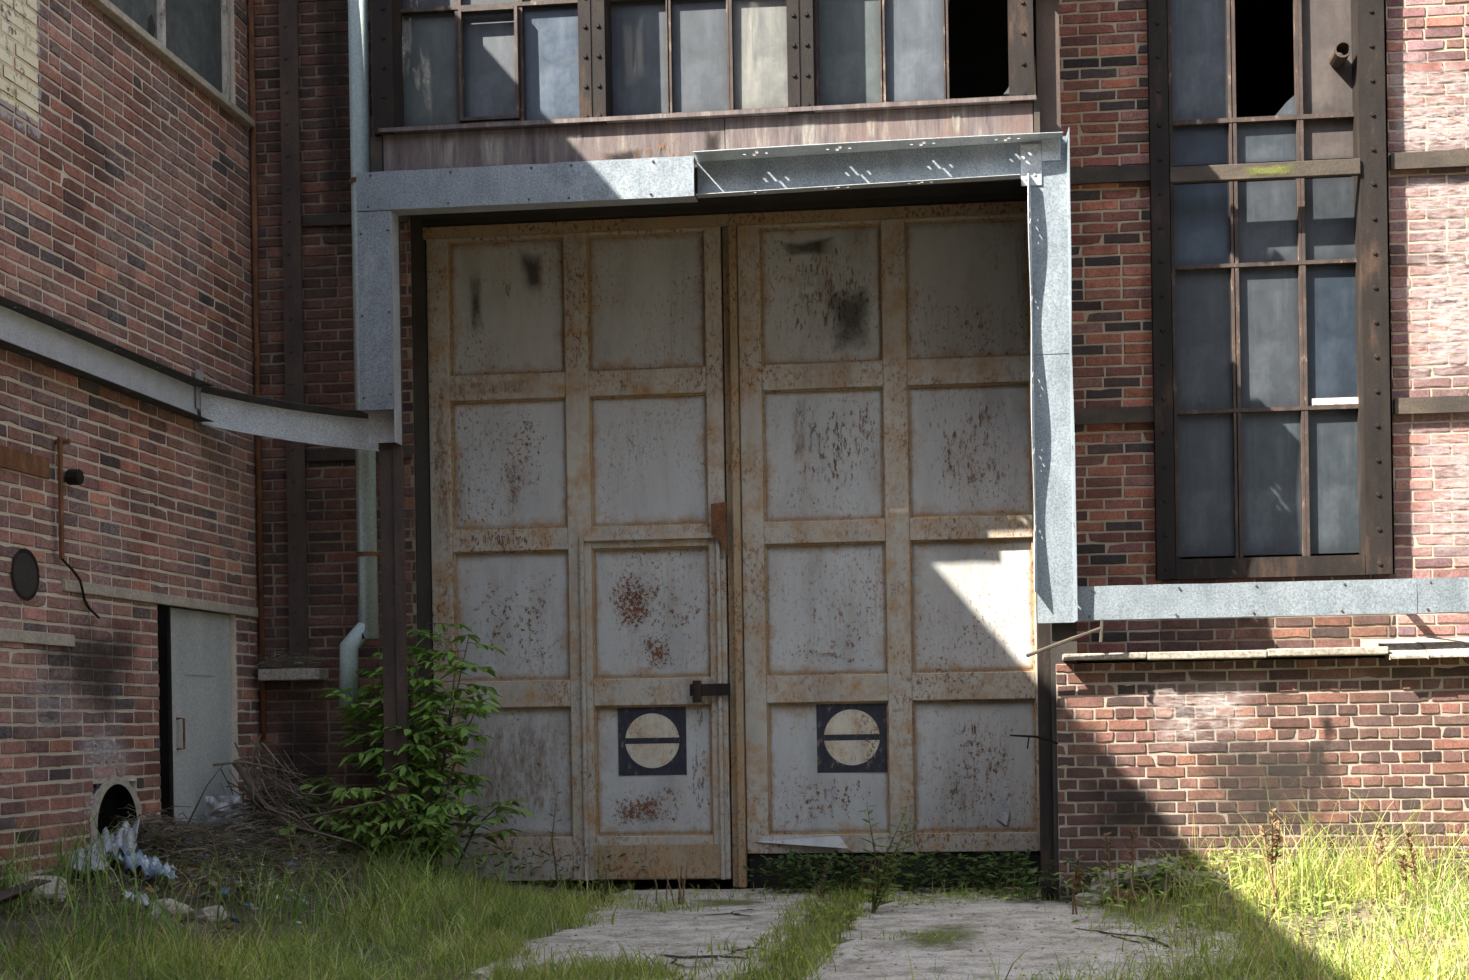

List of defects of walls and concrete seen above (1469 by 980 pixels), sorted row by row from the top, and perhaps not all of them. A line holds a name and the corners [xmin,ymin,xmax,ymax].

rust [479,413,551,516]
rust [792,400,875,506]
rust [610,566,701,670]
rust [609,747,710,830]